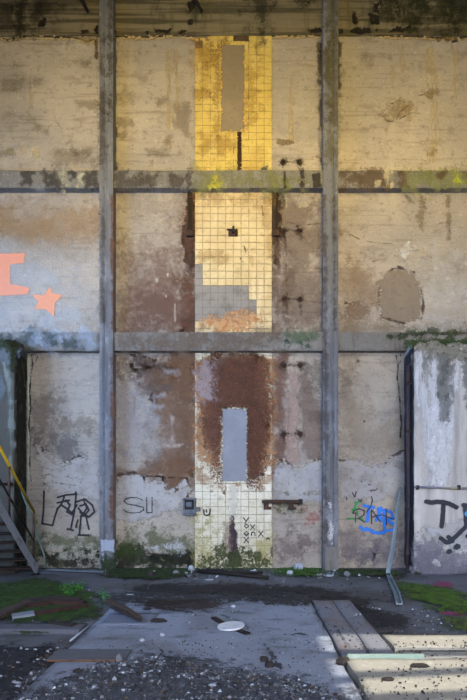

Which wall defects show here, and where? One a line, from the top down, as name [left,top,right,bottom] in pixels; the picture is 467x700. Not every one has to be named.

leakage [378,0,467,36]
spalling [218,36,249,170]
rust [182,193,195,268]
peeling [344,266,425,326]
rust [143,352,322,492]
peeling [272,457,332,512]
leakage [404,348,467,575]
leakage [147,541,195,567]
leakage [228,516,241,568]